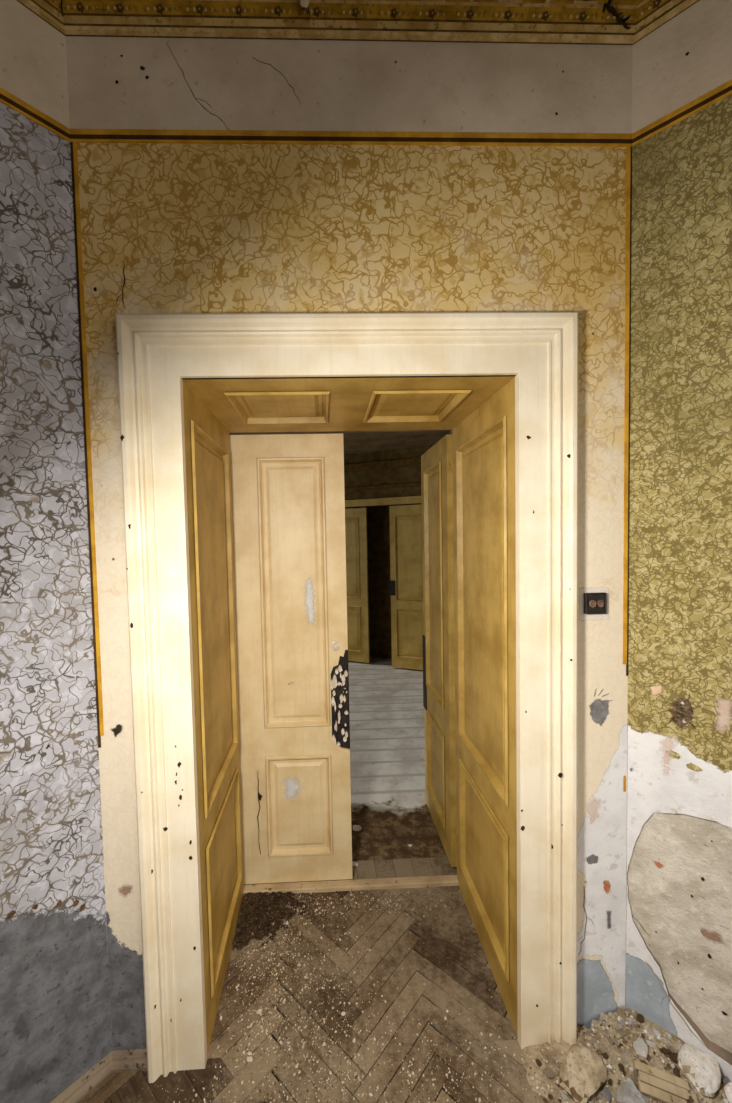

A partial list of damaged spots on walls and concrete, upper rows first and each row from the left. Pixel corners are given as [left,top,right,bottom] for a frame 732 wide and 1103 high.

crack [602,0,631,30]
flaking render [577,685,732,1082]
flaking render [0,898,156,1103]